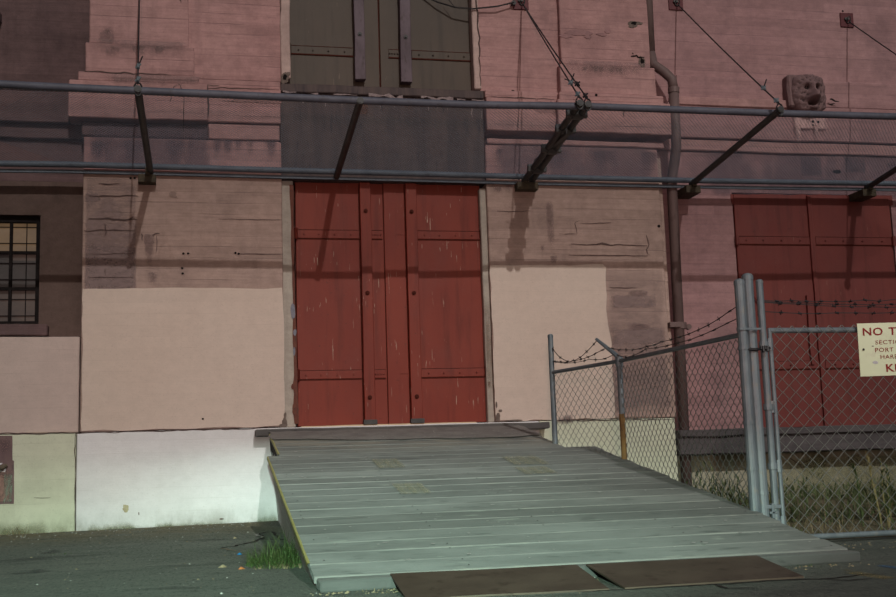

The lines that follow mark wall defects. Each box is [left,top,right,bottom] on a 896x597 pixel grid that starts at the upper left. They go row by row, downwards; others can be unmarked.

crack [84,69,167,77]